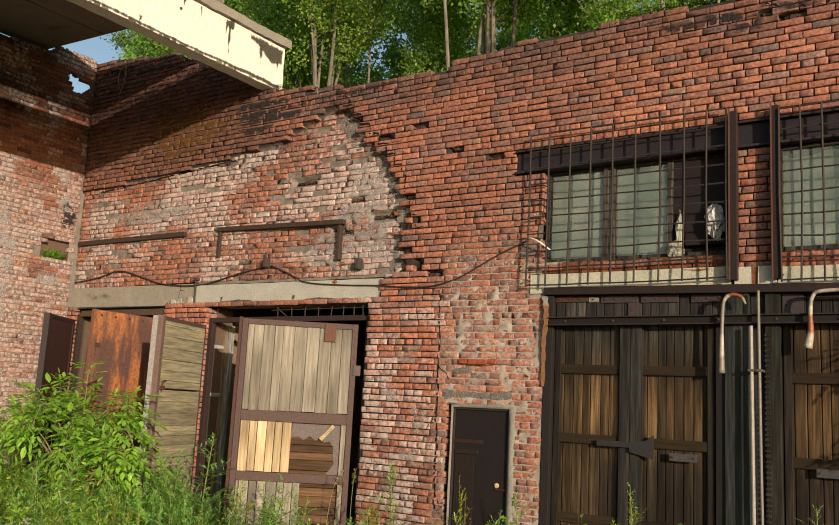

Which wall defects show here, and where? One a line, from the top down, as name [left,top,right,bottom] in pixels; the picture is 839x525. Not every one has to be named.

damp [92,0,283,88]
damp [239,97,305,139]
spalling [340,117,407,272]